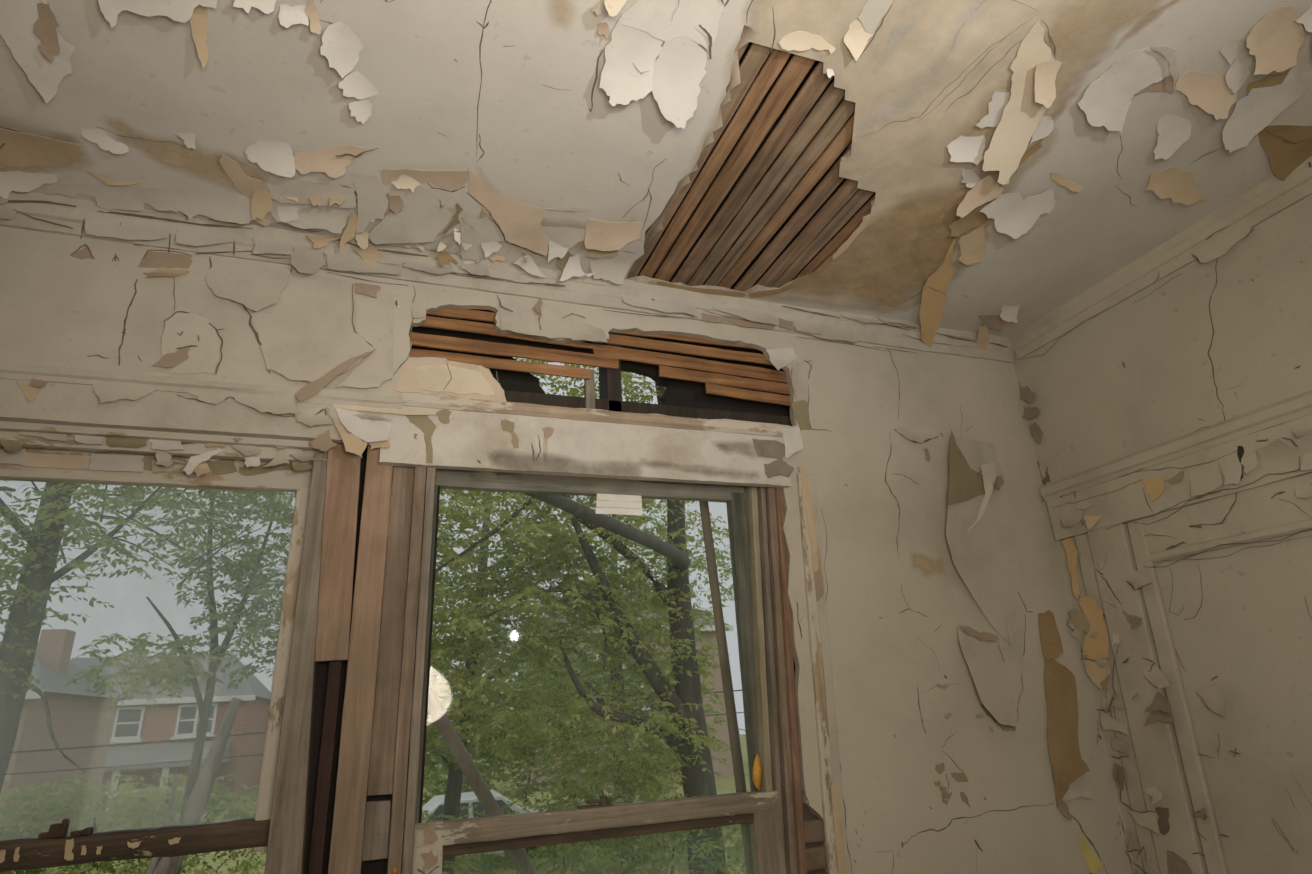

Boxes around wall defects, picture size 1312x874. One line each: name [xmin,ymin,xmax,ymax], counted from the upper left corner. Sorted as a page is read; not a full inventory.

crack [439,0,514,162]
crack [118,279,138,366]
crack [7,200,565,287]
flaking render [0,0,1312,478]
damp [805,187,973,304]
crack [1194,258,1247,432]
peeling [753,347,832,601]
crack [602,271,1181,746]
crack [1041,451,1312,673]
peeling [1142,446,1258,513]
peeling [1038,491,1229,874]
crack [802,790,1051,874]